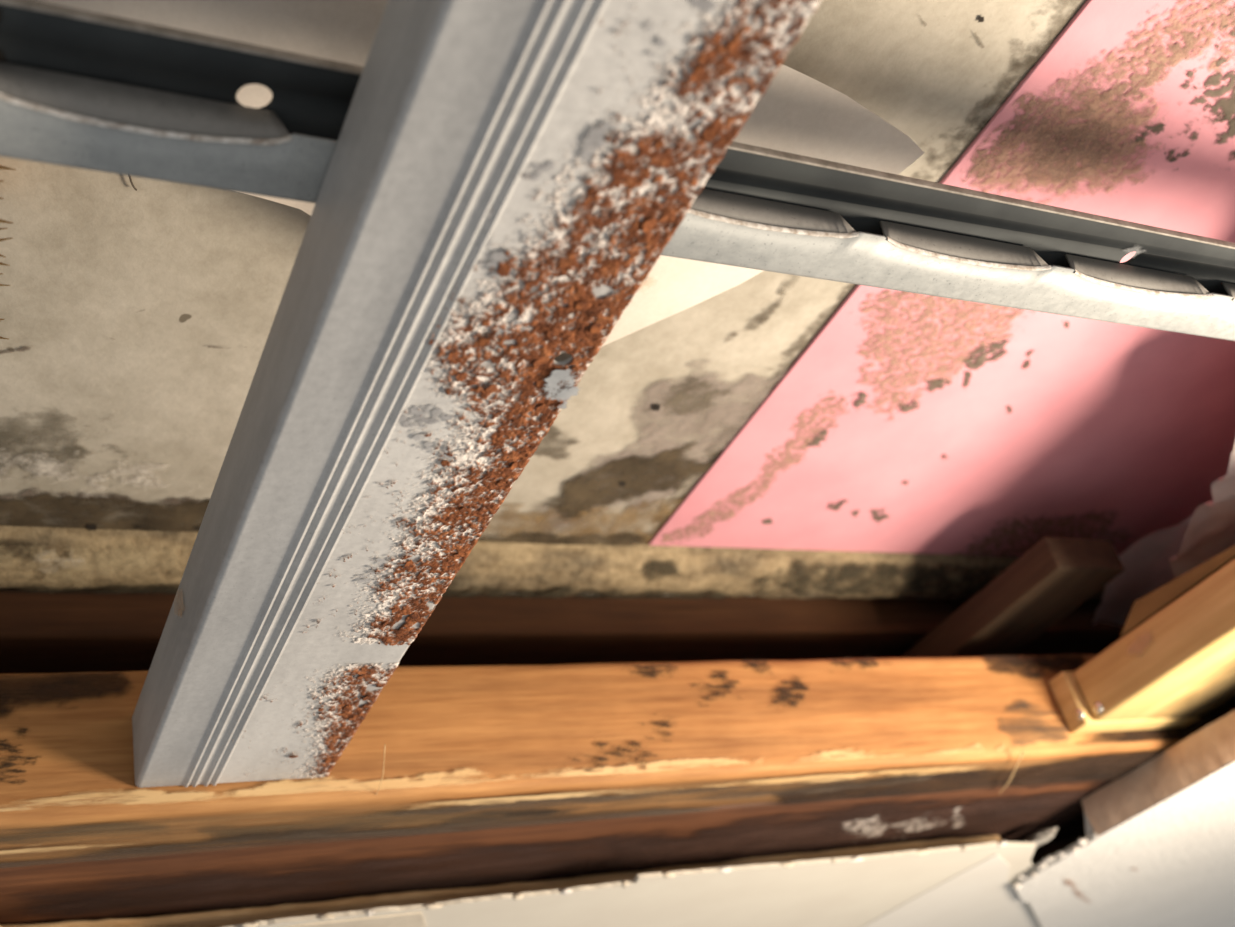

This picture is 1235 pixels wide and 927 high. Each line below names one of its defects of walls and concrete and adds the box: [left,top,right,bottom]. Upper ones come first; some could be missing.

leakage [964,0,1235,204]
rust [303,0,821,646]
leakage [0,415,210,532]
leakage [477,289,1024,546]
leakage [0,541,178,594]
leakage [442,561,727,600]
leakage [758,510,1133,596]
rust [276,662,400,779]
leakage [626,664,680,678]
leakage [743,659,808,707]
leakage [983,655,1084,678]
leakage [0,669,1235,916]